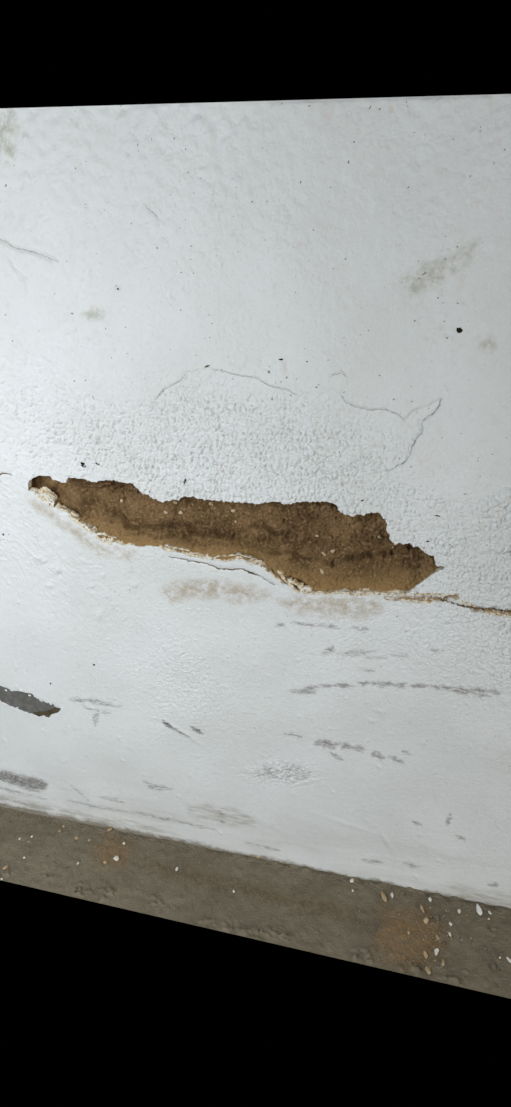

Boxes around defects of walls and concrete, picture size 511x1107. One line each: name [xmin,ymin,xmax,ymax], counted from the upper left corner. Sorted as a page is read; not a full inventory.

spalling [28,462,456,604]
crack [440,595,511,618]
peeling [0,686,66,718]